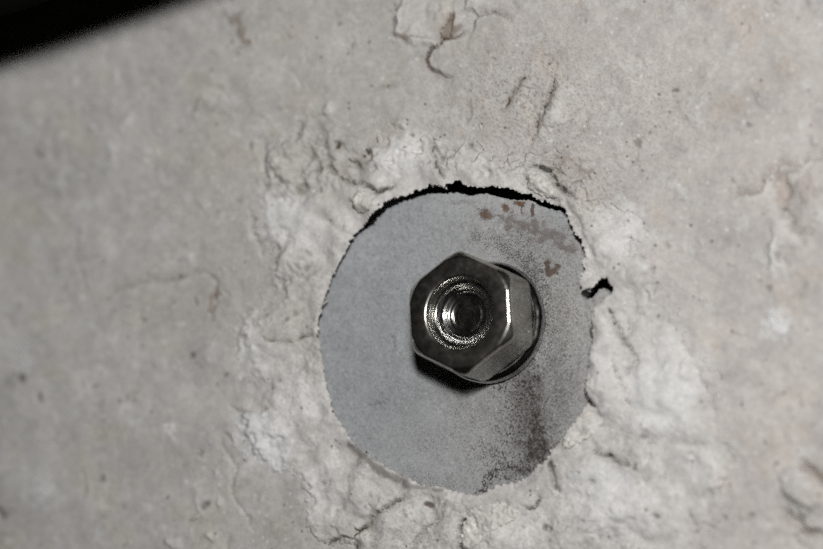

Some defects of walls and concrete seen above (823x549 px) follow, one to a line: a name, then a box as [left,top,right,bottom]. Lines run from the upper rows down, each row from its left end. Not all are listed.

spalling [538,85,571,138]
corrosion [479,201,576,253]
corrosion [544,260,560,277]
flaking render [230,115,747,549]